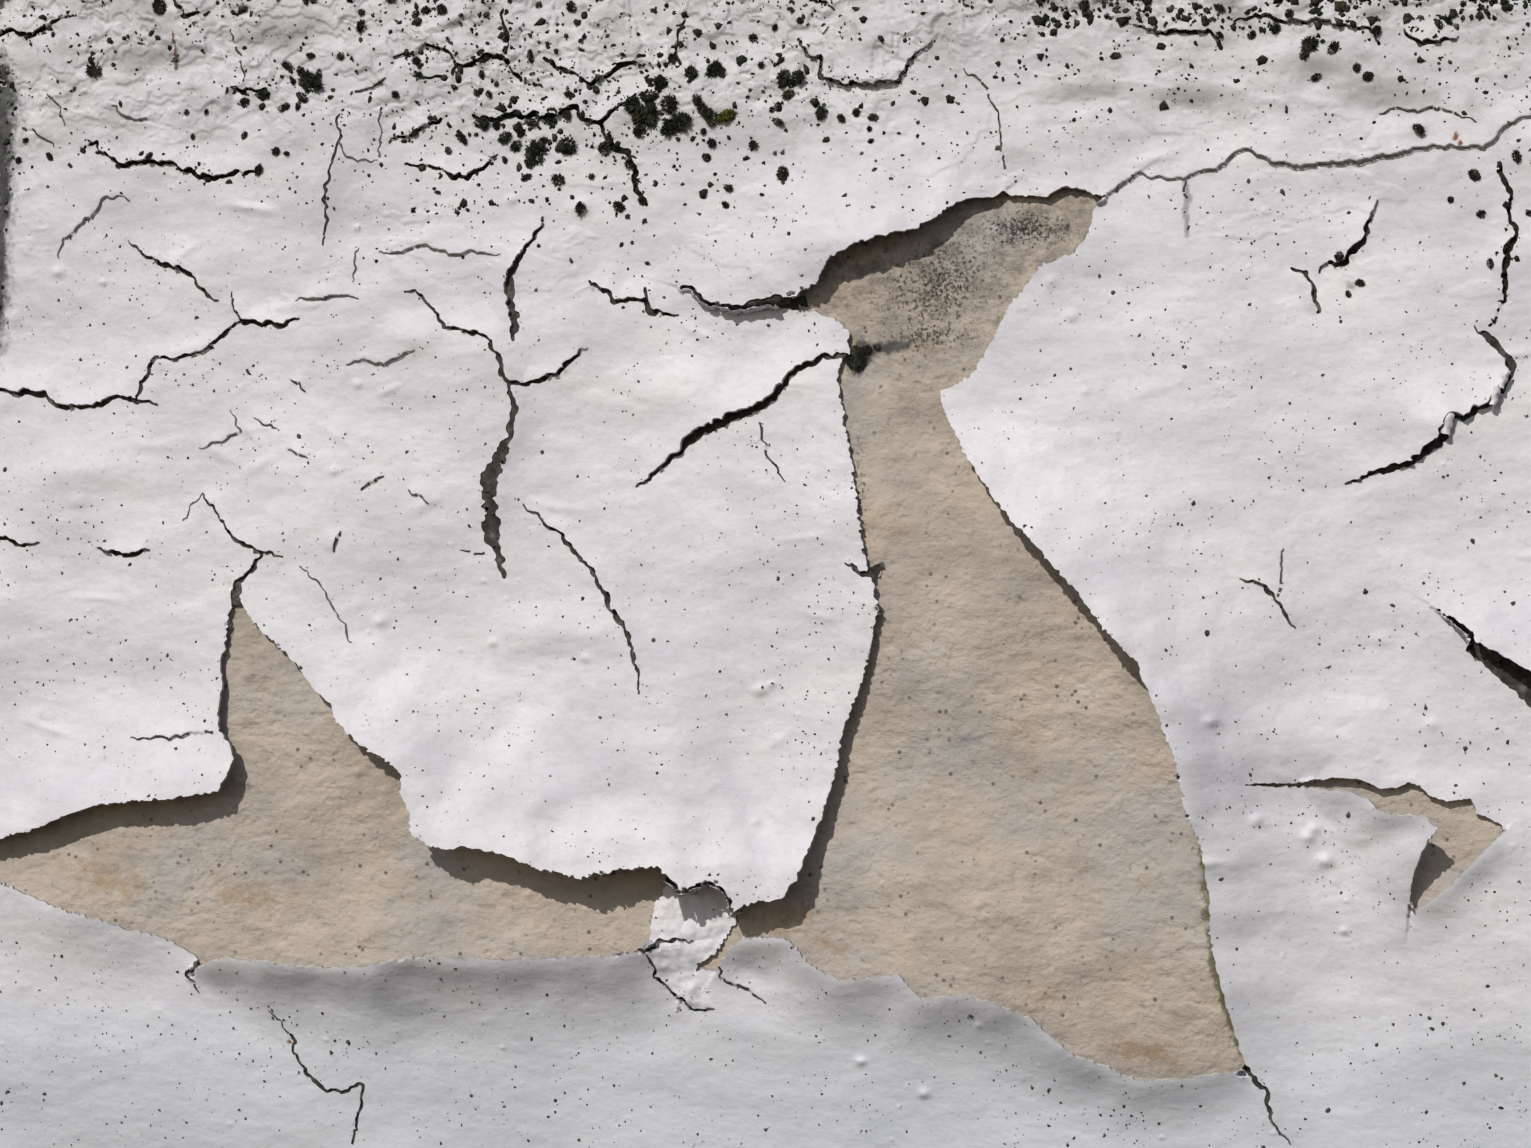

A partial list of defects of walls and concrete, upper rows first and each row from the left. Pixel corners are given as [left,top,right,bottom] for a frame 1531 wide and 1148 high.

crack [798,0,932,87]
damp [0,65,17,318]
crack [963,68,1006,195]
crack [0,0,686,694]
crack [589,281,808,317]
crack [1114,105,1531,485]
crack [636,352,847,487]
peeling [0,358,882,1034]
crack [844,562,885,578]
peeling [677,136,1531,1123]
crack [1239,548,1296,629]
crack [268,1010,365,1144]